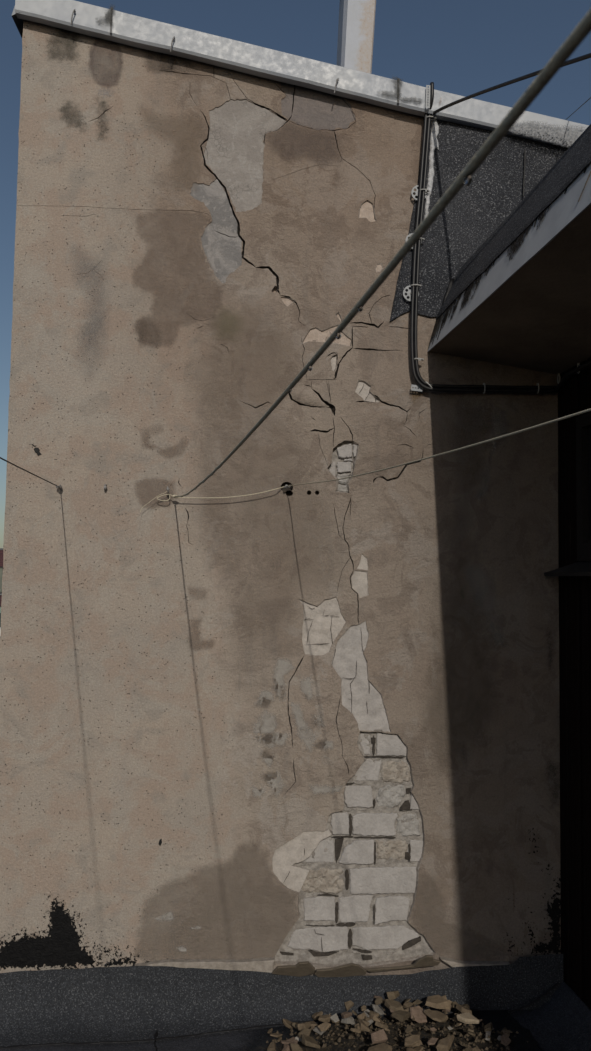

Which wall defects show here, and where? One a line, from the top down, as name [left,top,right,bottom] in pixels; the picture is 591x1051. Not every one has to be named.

flaking render [190,99,287,283]
spalling [359,200,377,222]
crack [165,71,430,483]
spalling [301,312,351,372]
spalling [328,440,359,493]
crack [333,498,359,623]
spalling [351,554,369,599]
crack [288,656,304,786]
spalling [272,597,441,977]